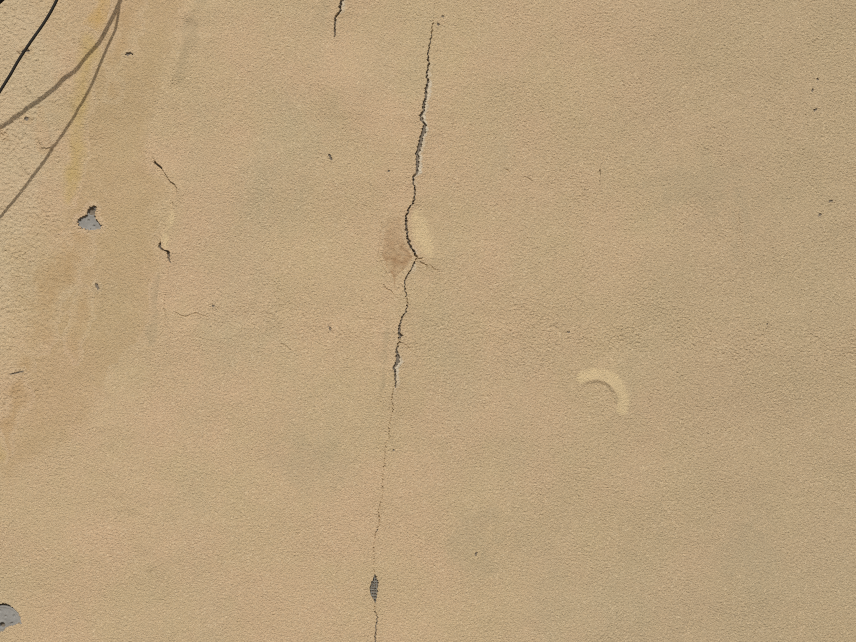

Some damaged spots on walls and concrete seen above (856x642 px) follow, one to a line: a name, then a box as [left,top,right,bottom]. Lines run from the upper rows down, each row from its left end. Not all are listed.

crack [325,0,352,57]
spalling [72,201,107,236]
crack [363,0,444,642]
spalling [0,598,27,639]